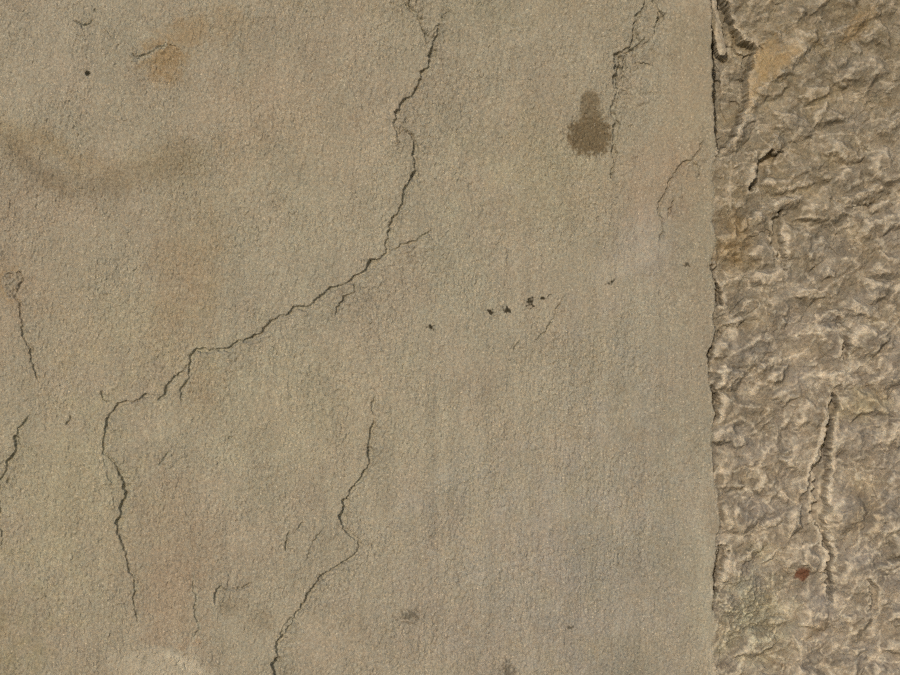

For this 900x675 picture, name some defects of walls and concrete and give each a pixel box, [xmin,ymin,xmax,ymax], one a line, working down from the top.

crack [72,16,168,61]
leakage [559,88,612,163]
crack [608,0,670,183]
crack [0,267,42,548]
crack [99,0,452,631]
crack [270,388,433,675]
crack [808,390,842,606]
crack [834,315,855,370]